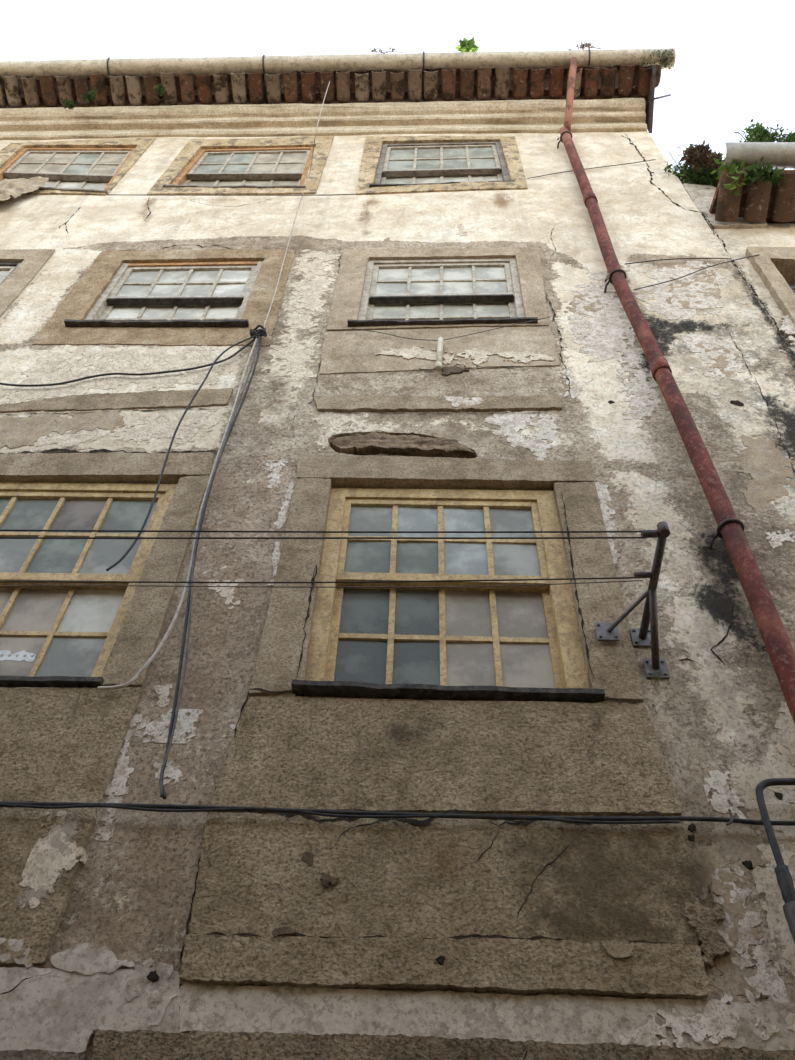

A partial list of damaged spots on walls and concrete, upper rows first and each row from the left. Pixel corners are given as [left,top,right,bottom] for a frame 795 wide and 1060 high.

peeling [0,345,231,451]
peeling [484,411,560,461]
leakage [644,314,751,356]
crack [621,135,794,366]
leakage [734,261,795,368]
leakage [759,395,795,459]
crack [227,565,317,755]
leakage [694,529,767,660]
peeling [94,679,203,841]
crack [180,856,262,966]
crack [234,809,663,943]
peeling [618,770,795,1048]